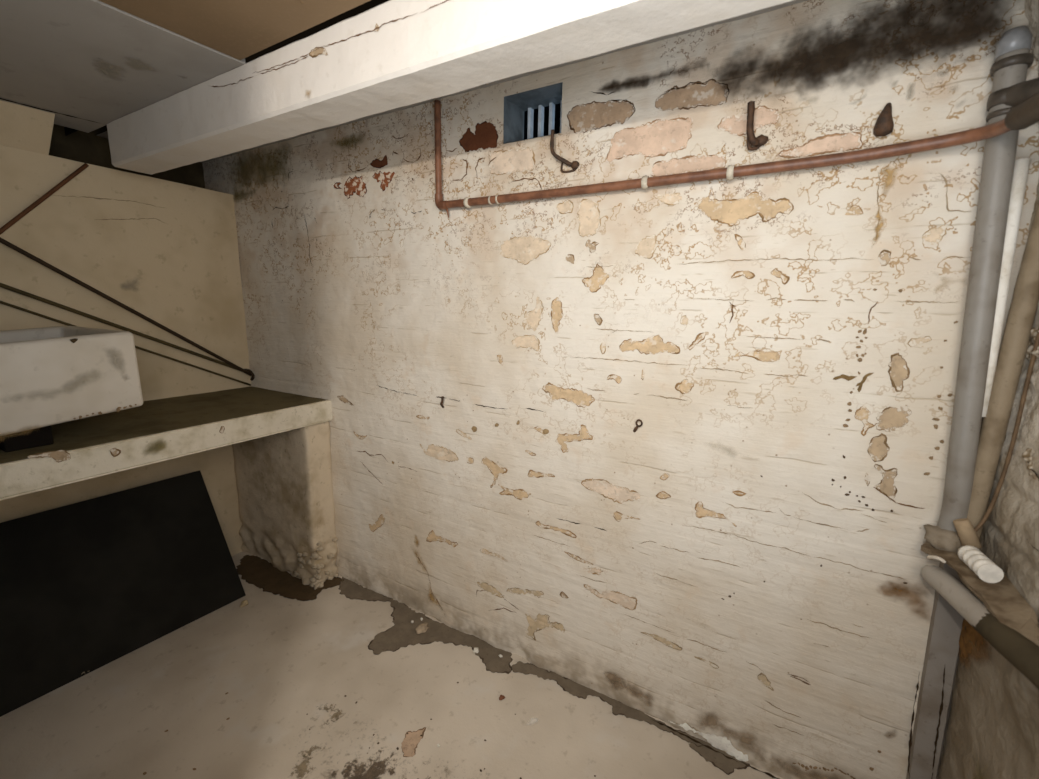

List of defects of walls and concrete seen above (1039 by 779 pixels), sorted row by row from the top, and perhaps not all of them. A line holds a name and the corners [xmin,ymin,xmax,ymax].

flaking render [459,79,780,177]
flaking render [776,132,863,159]
spalling [334,155,395,199]
peeling [697,191,794,251]
peeling [556,199,609,292]
peeling [619,332,707,355]
peeling [888,336,931,392]
peeling [542,382,595,408]
peeling [831,405,912,512]
leakage [606,673,649,703]
leakage [701,715,760,755]
leakage [788,763,856,779]